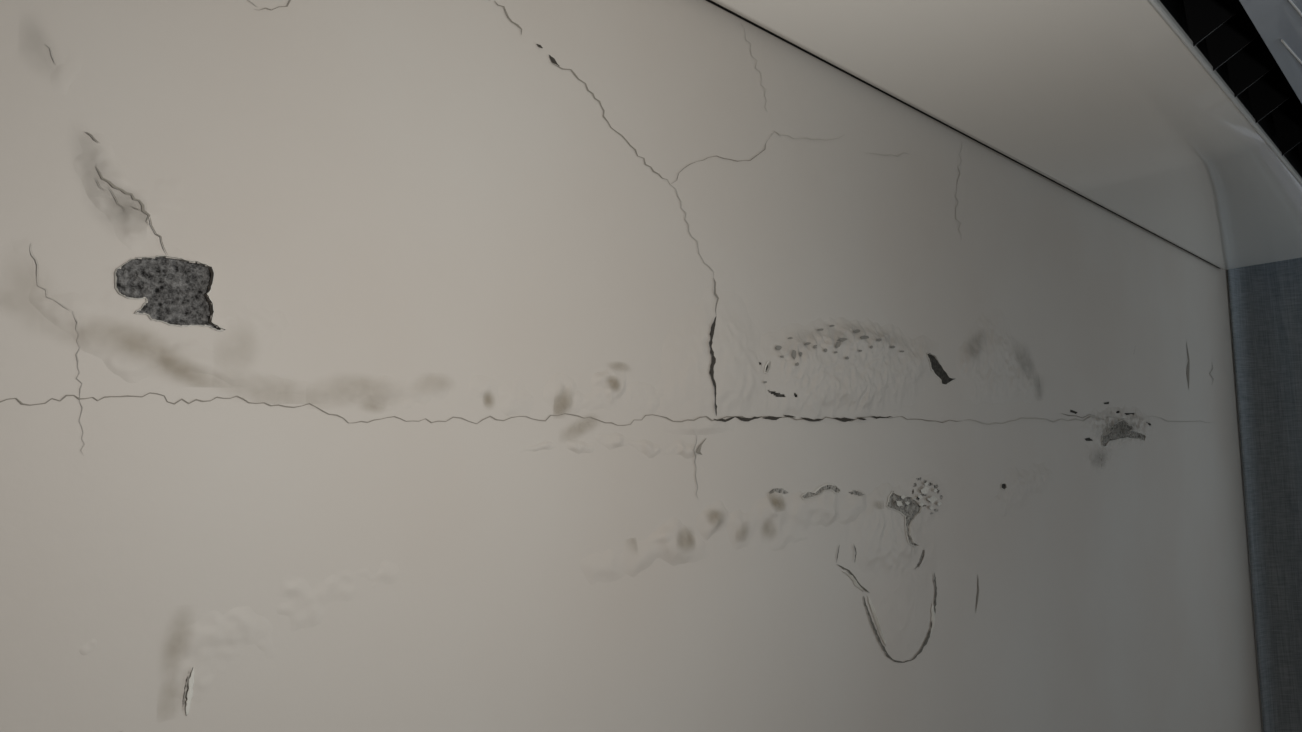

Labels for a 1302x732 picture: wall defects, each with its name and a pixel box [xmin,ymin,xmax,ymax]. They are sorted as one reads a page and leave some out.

flaking render [114,255,226,331]
crack [0,3,1214,499]
flaking render [1085,402,1151,447]
flaking render [886,477,943,568]
peeling [837,545,937,663]